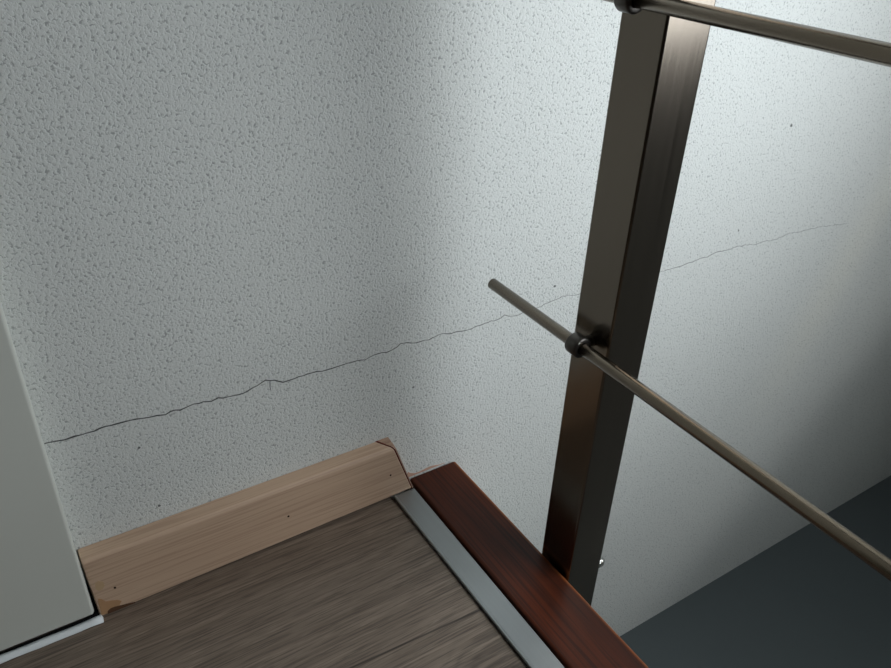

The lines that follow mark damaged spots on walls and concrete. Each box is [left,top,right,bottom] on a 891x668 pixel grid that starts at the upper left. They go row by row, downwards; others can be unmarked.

crack [44,294,579,444]